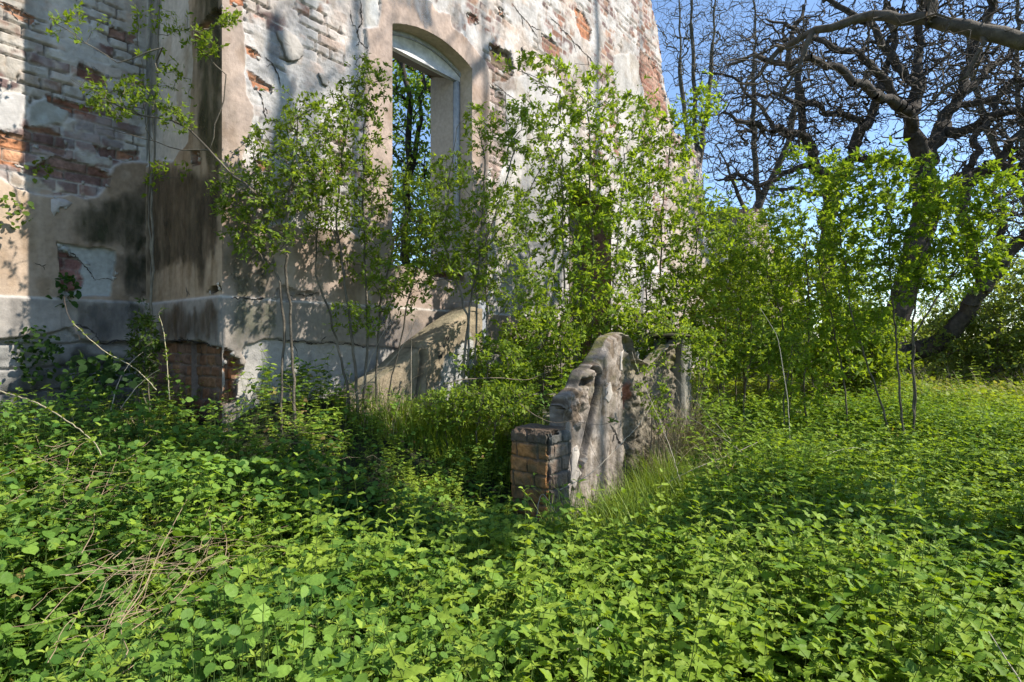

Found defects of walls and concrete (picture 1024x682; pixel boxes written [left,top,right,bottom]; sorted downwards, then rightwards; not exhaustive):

flaking render [0,1,40,26]
flaking render [107,24,139,45]
crack [350,1,368,51]
flaking render [45,94,91,116]
flaking render [77,62,109,90]
flaking render [245,44,274,93]
flaking render [639,48,668,120]
flaking render [0,125,141,188]
flaking render [56,241,118,297]
leakage [82,167,221,338]
flaking render [163,340,244,405]